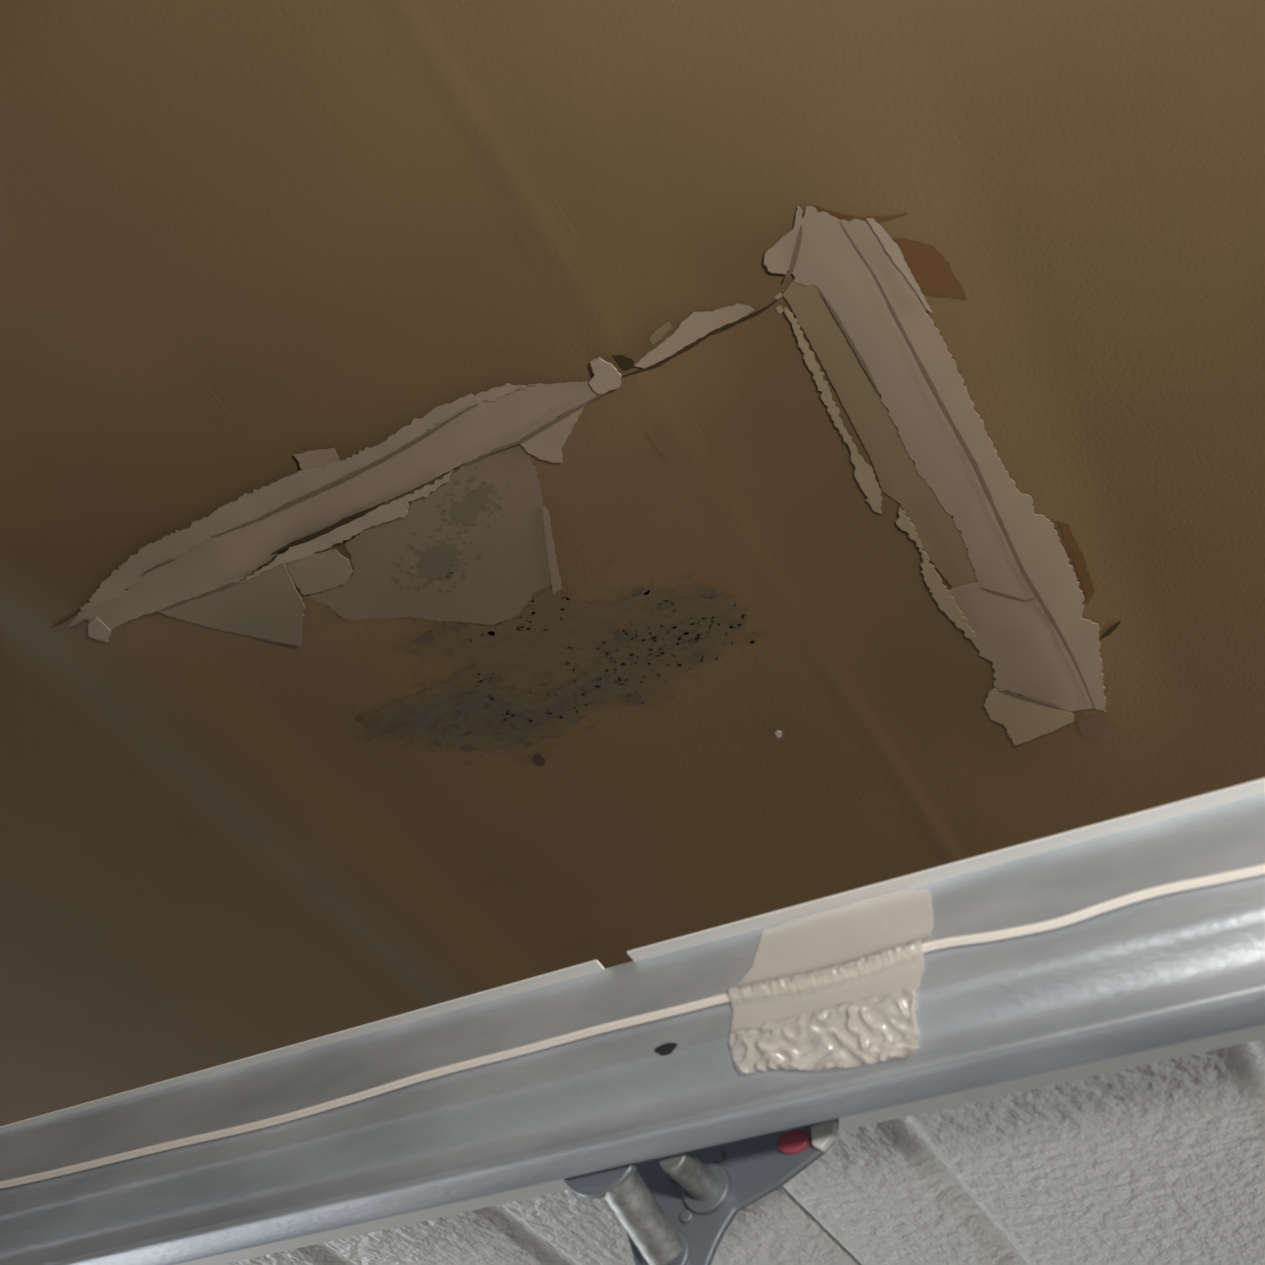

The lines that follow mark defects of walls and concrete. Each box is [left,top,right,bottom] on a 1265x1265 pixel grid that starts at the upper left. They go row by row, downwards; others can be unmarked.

peeling [284,357,622,625]
peeling [634,303,755,368]
crack [467,205,1095,710]
peeling [764,206,978,588]
peeling [88,616,111,642]
water stain [351,575,768,766]
peeling [984,687,1074,745]
crack [1099,621,1121,640]